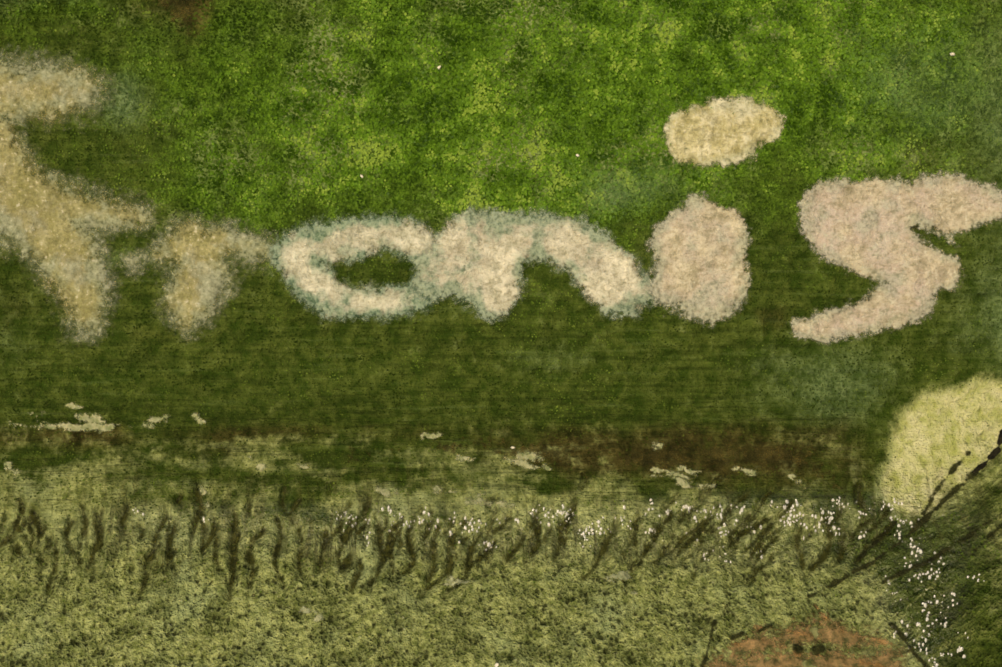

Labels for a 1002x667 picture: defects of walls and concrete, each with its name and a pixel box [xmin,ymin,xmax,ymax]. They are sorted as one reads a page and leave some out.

damp [0,500,57,599]
damp [63,506,104,569]
damp [137,515,177,598]
damp [192,485,265,600]
damp [272,490,301,587]
damp [296,526,304,570]
damp [318,497,511,600]
damp [506,504,576,563]
damp [582,529,614,579]
damp [622,491,792,583]
damp [794,506,893,577]
crack [807,430,1002,598]